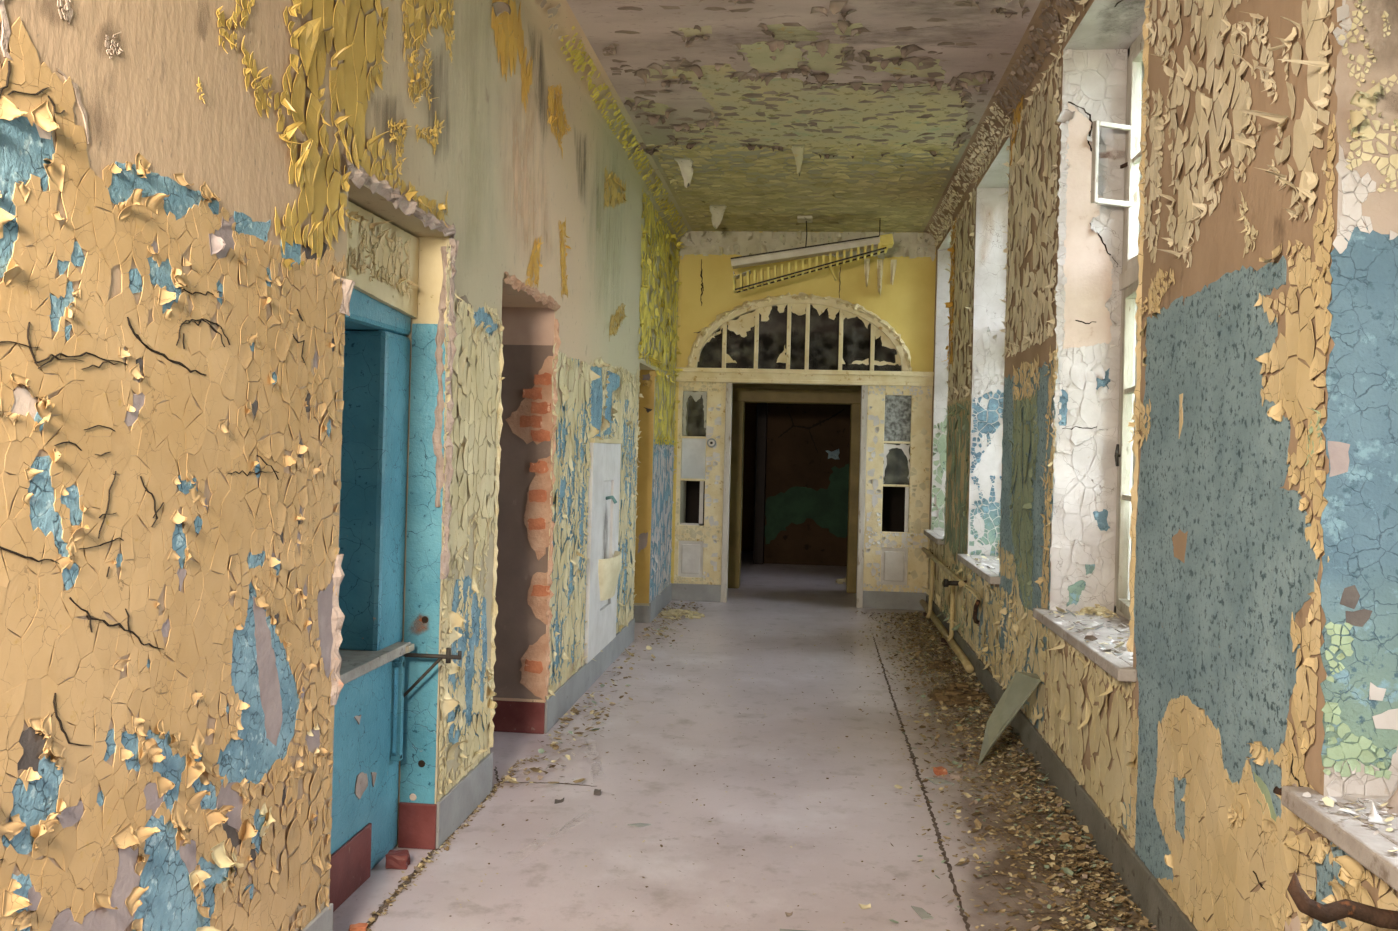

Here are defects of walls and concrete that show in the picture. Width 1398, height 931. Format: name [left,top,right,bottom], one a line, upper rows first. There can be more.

peeling [0,94,65,286]
peeling [106,152,221,220]
peeling [45,241,85,341]
peeling [128,256,188,320]
peeling [22,448,90,590]
crack [0,13,347,931]
peeling [209,0,505,801]
peeling [504,0,1398,883]
peeling [2,873,41,931]
peeling [0,713,83,855]
peeling [50,551,321,931]
crack [366,767,593,927]